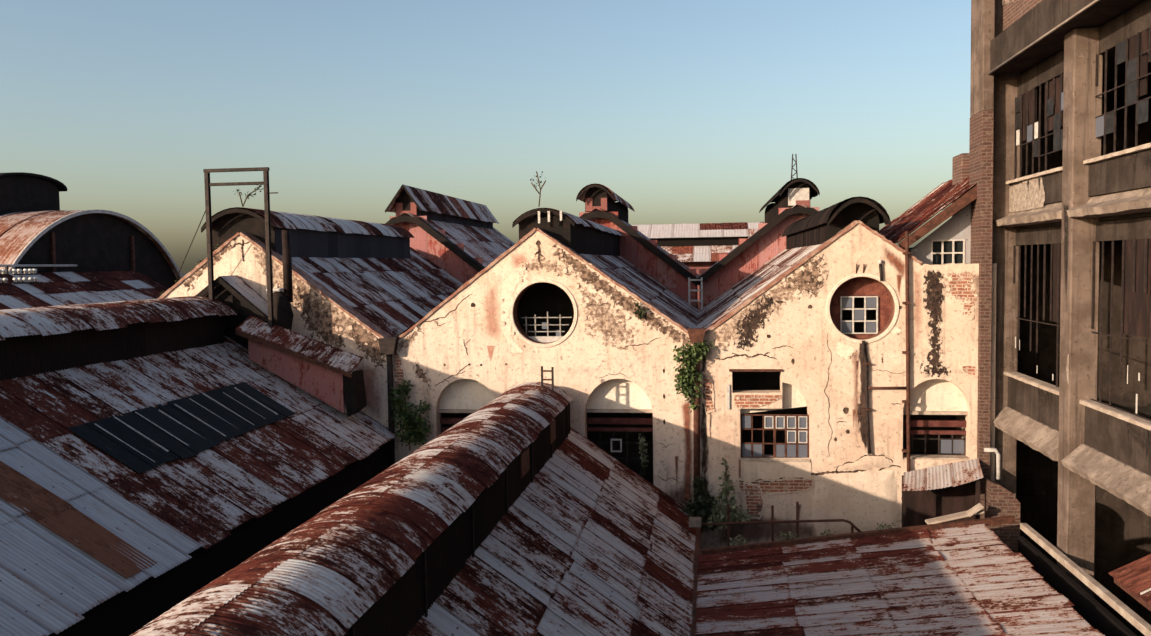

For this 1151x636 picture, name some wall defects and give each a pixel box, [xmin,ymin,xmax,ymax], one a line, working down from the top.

mould [736,294,777,351]
leakage [923,270,946,377]
flaking render [943,271,978,320]
corrosion [0,461,157,578]
corrosion [675,402,691,501]
flaking render [737,478,815,520]